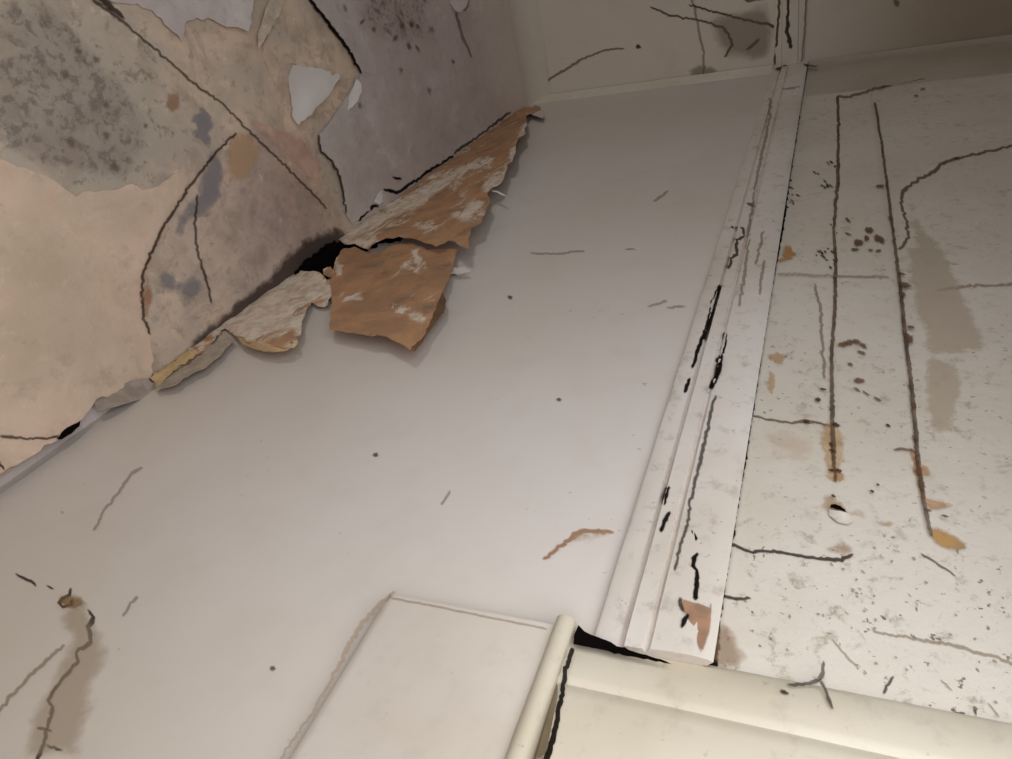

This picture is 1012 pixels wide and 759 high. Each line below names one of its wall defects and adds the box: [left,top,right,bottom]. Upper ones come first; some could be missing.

water stain [0,9,147,170]
water stain [178,158,221,230]
peeling [0,0,403,479]
water stain [194,109,211,141]
crack [93,0,511,334]
crack [660,226,745,600]
crack [709,78,1012,667]
water stain [930,361,958,428]
water stain [912,234,978,351]
crack [16,574,95,759]
peeling [678,598,711,649]
crack [788,662,833,709]